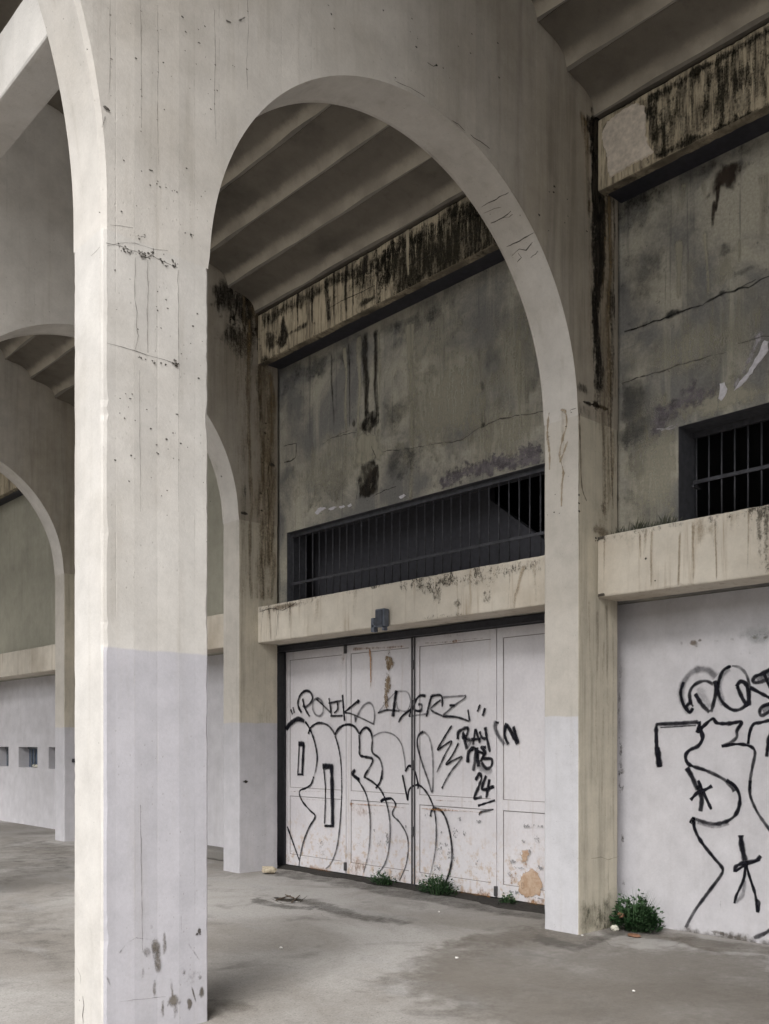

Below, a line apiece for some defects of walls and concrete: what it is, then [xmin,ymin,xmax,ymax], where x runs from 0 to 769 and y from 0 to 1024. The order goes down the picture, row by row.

leakage [640,28,769,158]
crack [108,225,193,268]
crack [409,192,513,266]
crack [507,233,538,262]
leakage [296,107,764,532]
crack [624,276,769,332]
leakage [214,202,496,610]
crack [384,411,543,452]
spalling [650,332,768,437]
leakage [748,506,769,569]
peeling [508,824,543,899]